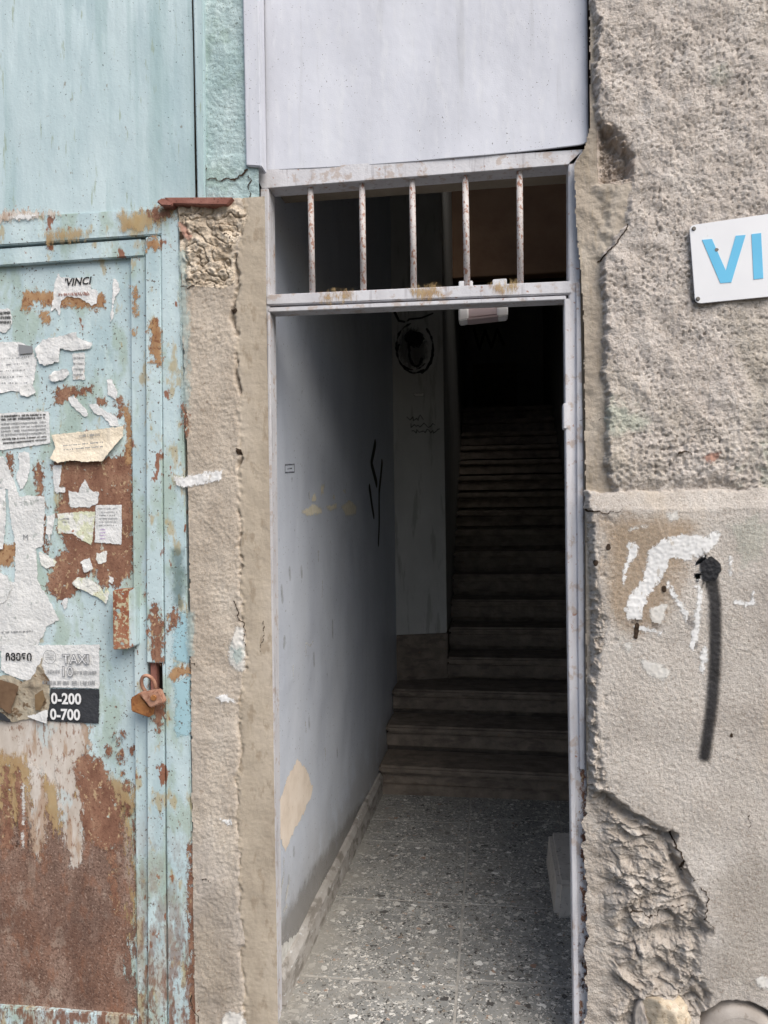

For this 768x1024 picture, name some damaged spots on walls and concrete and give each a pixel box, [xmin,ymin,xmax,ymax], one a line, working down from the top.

crack [206,168,252,197]
corrosion [44,228,88,246]
corrosion [117,205,178,253]
spalling [178,203,248,289]
corrosion [129,285,164,370]
corrosion [2,451,16,477]
corrosion [32,384,134,604]
corrosion [0,542,16,571]
peeling [280,759,313,851]
spalling [581,549,715,1024]
corrosion [0,730,138,1014]
corrosion [577,769,588,1024]